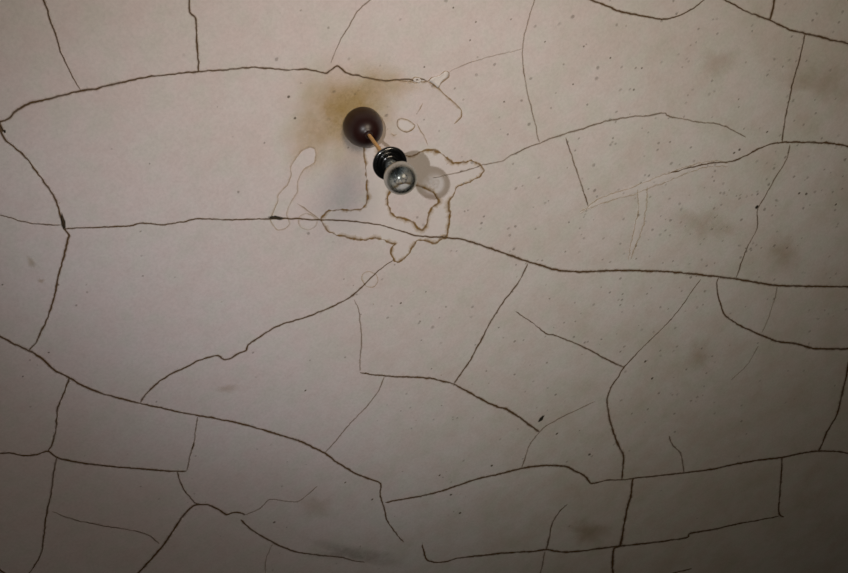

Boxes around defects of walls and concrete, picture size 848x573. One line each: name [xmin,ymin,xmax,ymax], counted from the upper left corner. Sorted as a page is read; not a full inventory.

crack [0,0,426,224]
crack [0,218,848,573]
crack [282,0,848,440]